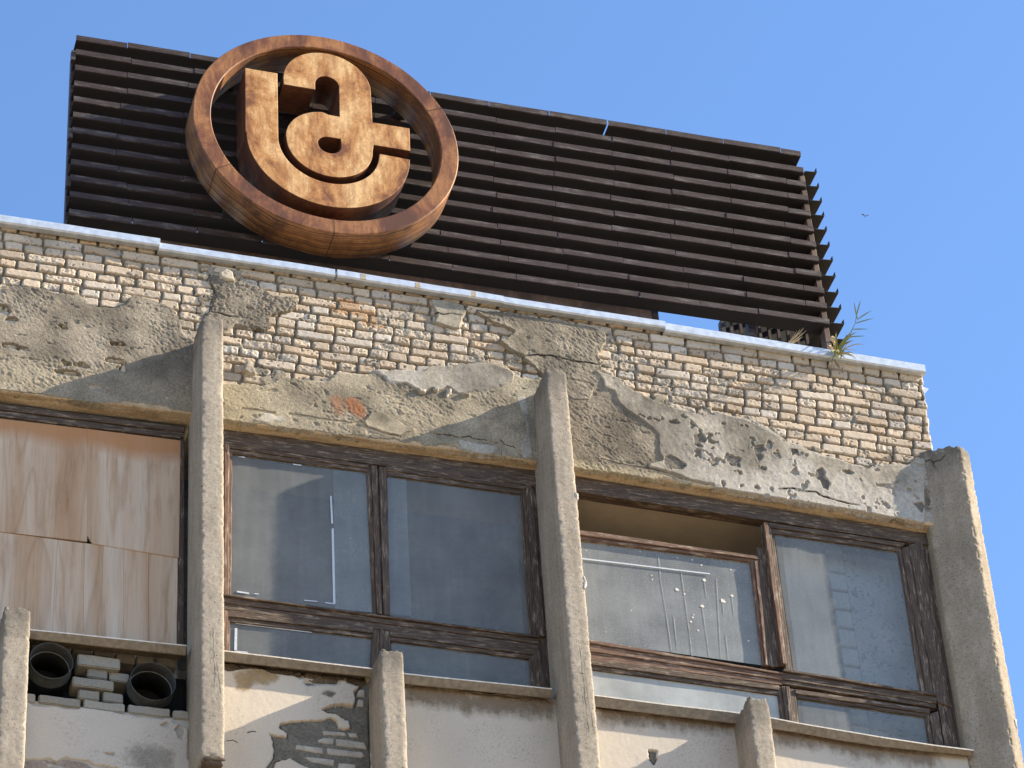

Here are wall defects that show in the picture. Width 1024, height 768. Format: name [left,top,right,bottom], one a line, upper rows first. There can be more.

crack [510,353,603,392]
peeling [223,299,934,530]
crack [436,434,523,462]
crack [780,487,858,506]
peeling [224,661,370,768]